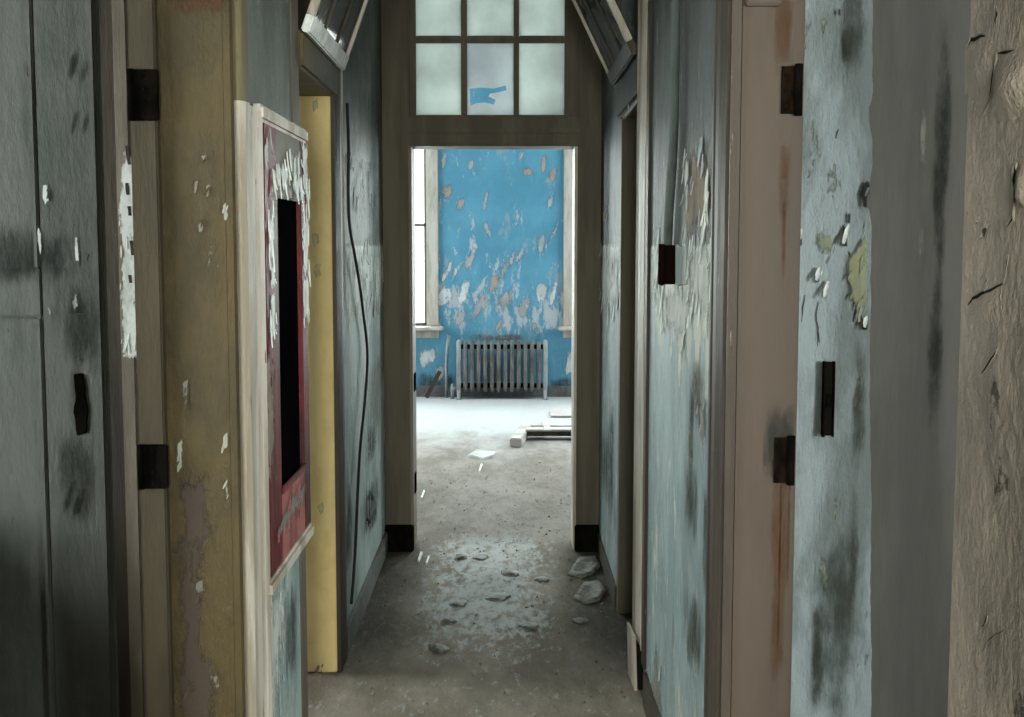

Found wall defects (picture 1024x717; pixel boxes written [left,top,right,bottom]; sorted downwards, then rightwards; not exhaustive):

crack [966,5,1014,116]
peeling [118,146,137,358]
peeling [265,128,321,481]
peeling [442,186,465,209]
peeling [439,248,557,335]
peeling [517,152,556,211]
peeling [564,352,572,375]
peeling [651,137,711,354]
peeling [815,181,870,330]
crack [968,254,1009,309]
corrosion [773,485,791,662]
water stain [814,531,857,693]